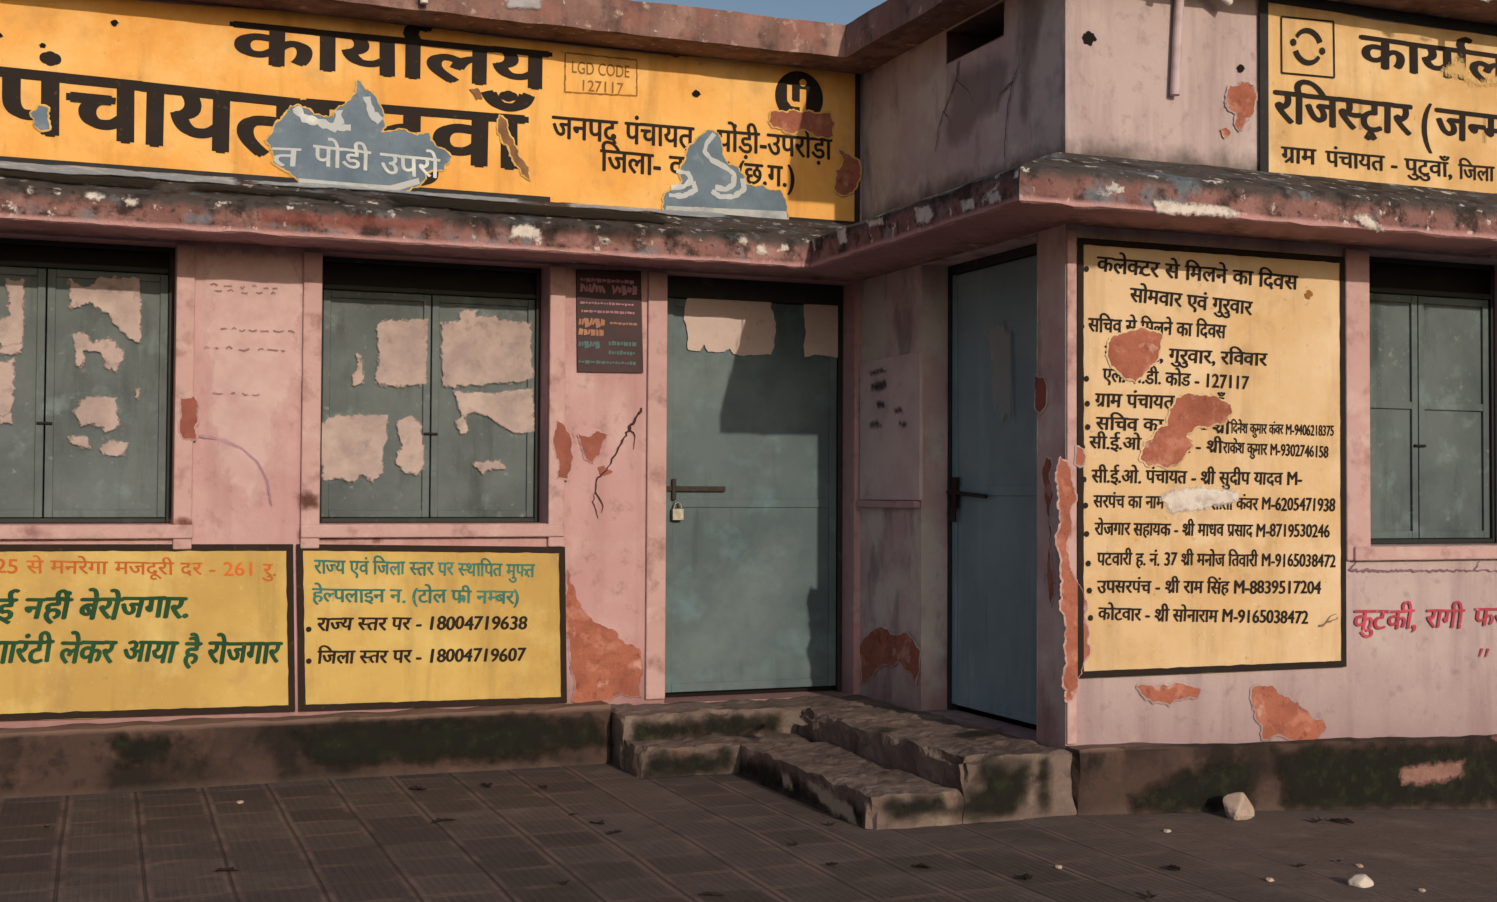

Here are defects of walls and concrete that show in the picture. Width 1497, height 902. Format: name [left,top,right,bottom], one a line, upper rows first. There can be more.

peeling [264,79,452,191]
peeling [661,129,789,220]
peeling [1220,64,1258,139]
peeling [1105,325,1164,384]
peeling [177,392,260,441]
peeling [551,419,612,481]
crack [592,408,642,517]
peeling [1138,391,1234,470]
peeling [1041,445,1092,703]
peeling [565,569,644,703]
peeling [1136,681,1202,708]
peeling [1249,683,1327,741]